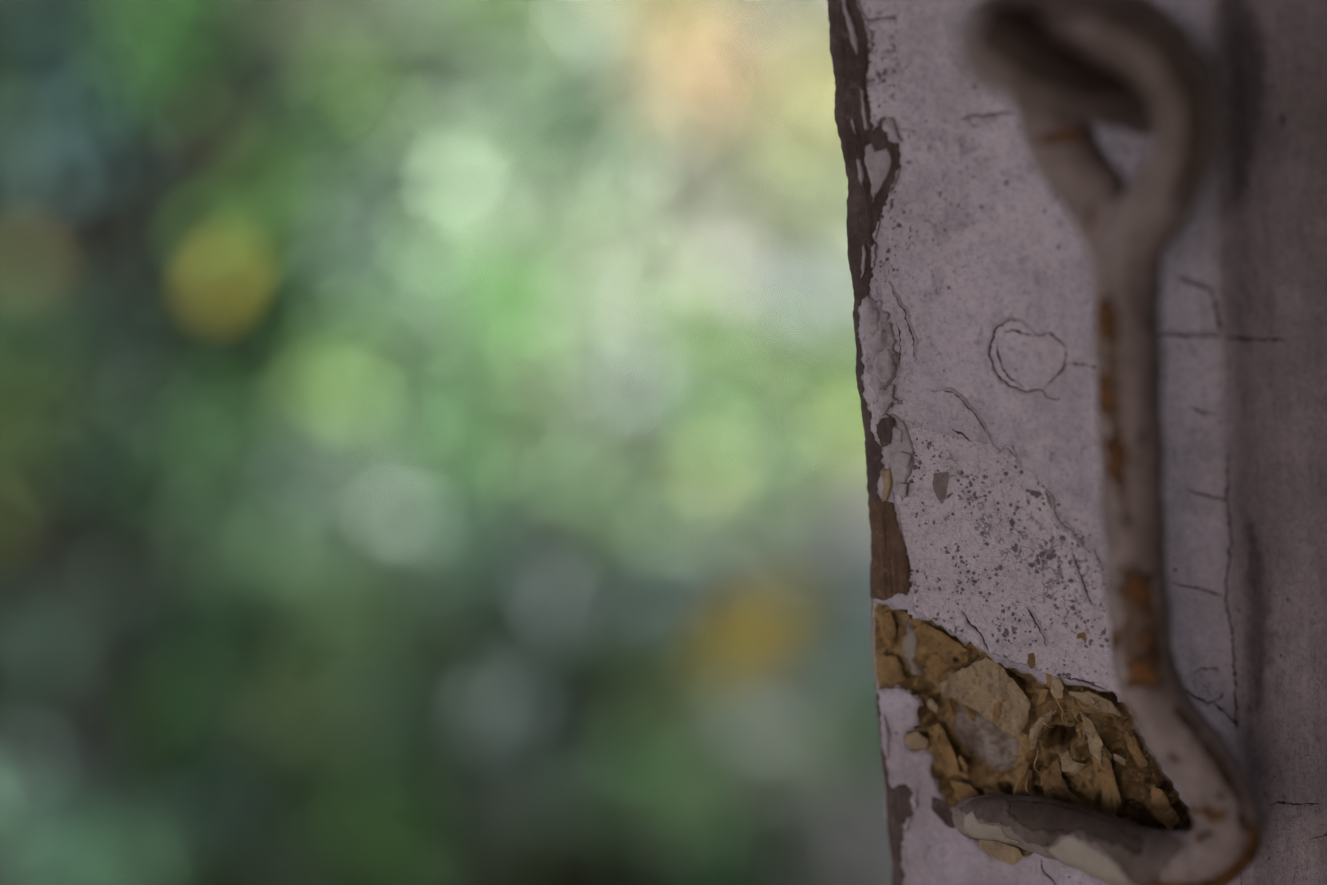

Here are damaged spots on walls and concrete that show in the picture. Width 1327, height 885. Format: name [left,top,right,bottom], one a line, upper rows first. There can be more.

crack [889,280,920,366]
spalling [827,0,1195,885]
crack [933,387,1105,605]
crack [986,315,1096,402]
corrosion [1095,295,1128,492]
crack [1160,275,1289,342]
corrosion [1111,565,1162,688]
corrosion [1145,706,1260,885]